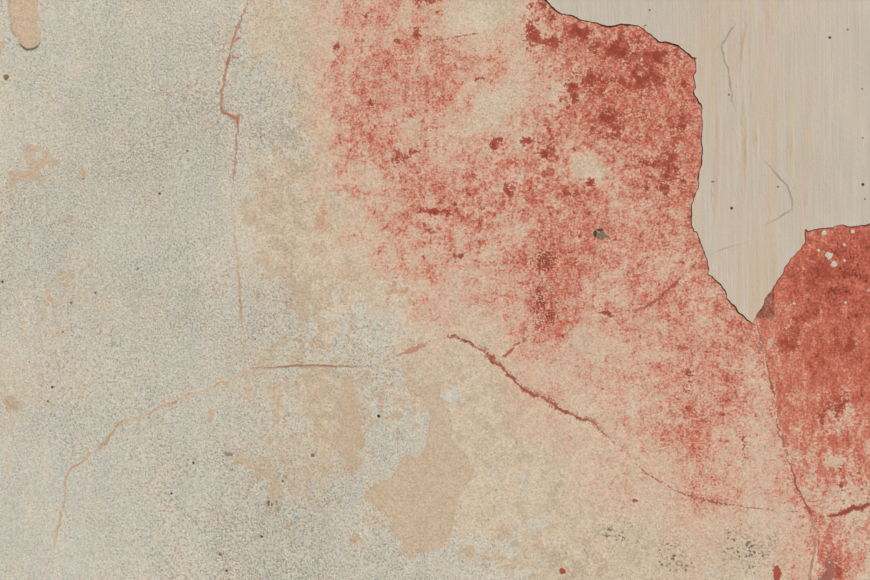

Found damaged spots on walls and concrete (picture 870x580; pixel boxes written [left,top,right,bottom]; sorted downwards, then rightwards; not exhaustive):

peeling [0,0,43,57]
crack [36,3,371,580]
peeling [285,0,870,580]
crack [400,323,870,580]